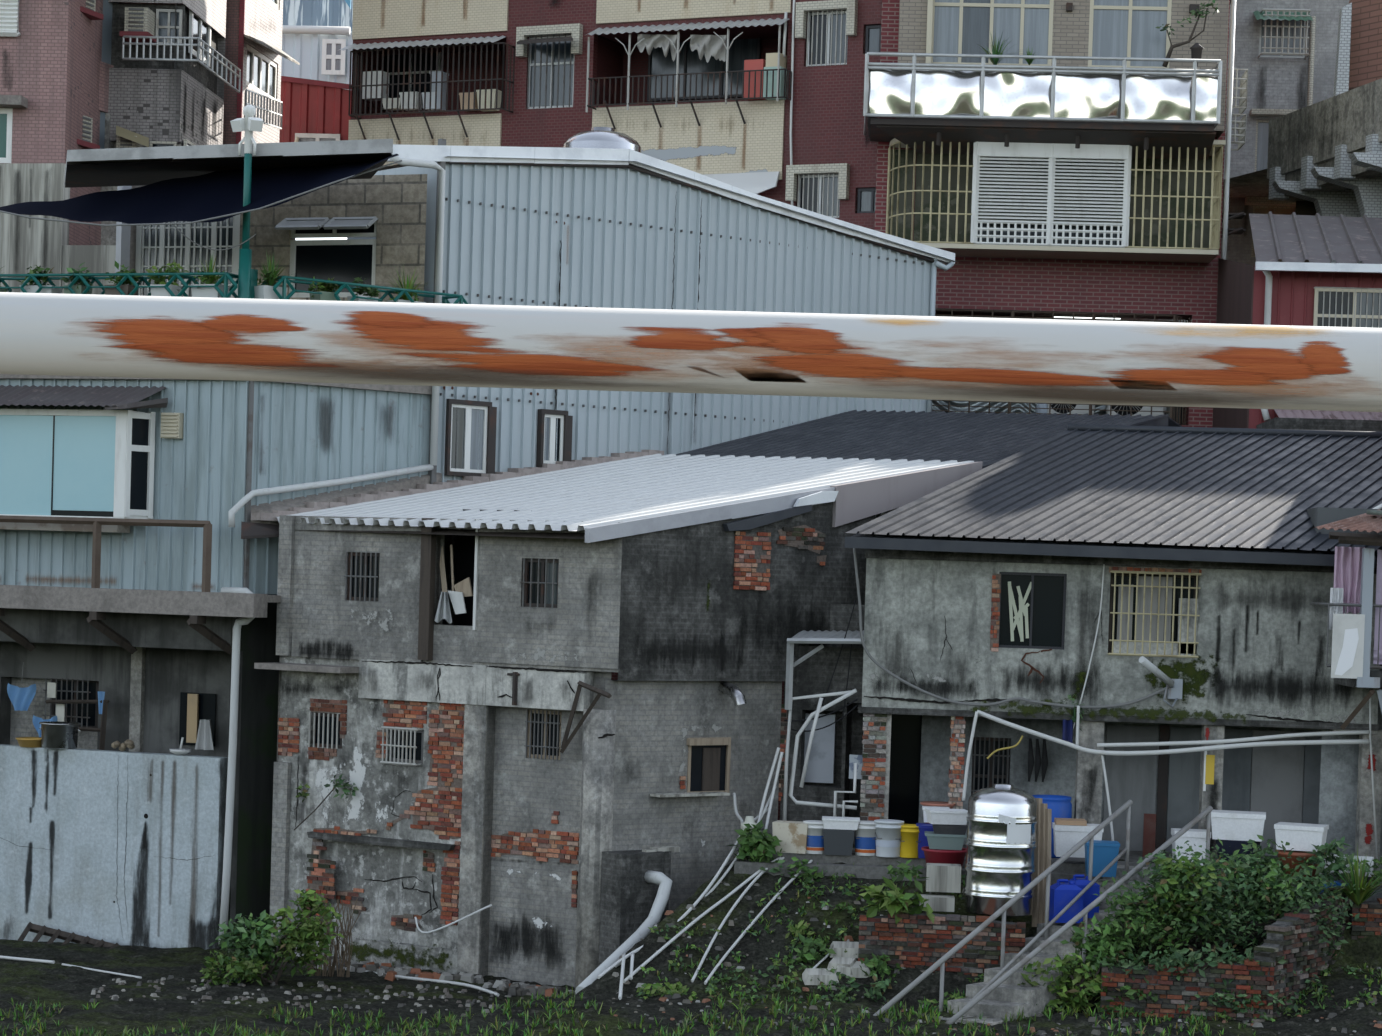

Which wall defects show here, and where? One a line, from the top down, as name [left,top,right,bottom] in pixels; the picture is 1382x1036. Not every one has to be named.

rust [89,311,1351,404]
flaking render [733,525,827,590]
leakage [876,635,976,697]
leakage [1006,594,1098,701]
leakage [1210,590,1352,705]
flaking render [278,698,347,761]
leakage [30,750,58,919]
leakage [132,822,172,947]
leakage [150,762,175,844]
leakage [188,857,222,950]
flaking render [305,700,465,945]
flaking render [491,811,579,907]